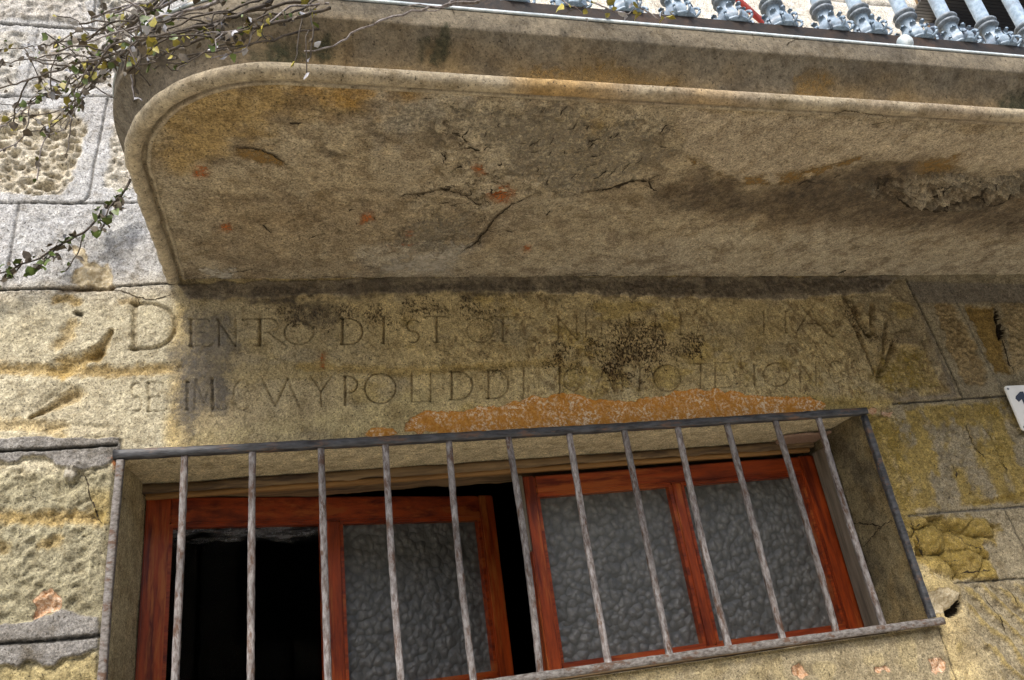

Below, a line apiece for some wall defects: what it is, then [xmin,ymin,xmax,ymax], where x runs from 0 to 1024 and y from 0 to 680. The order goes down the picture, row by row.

crack [401,107,668,253]
damp [744,156,1014,226]
damp [602,338,653,382]
spalling [33,588,62,620]
spalling [928,587,960,618]